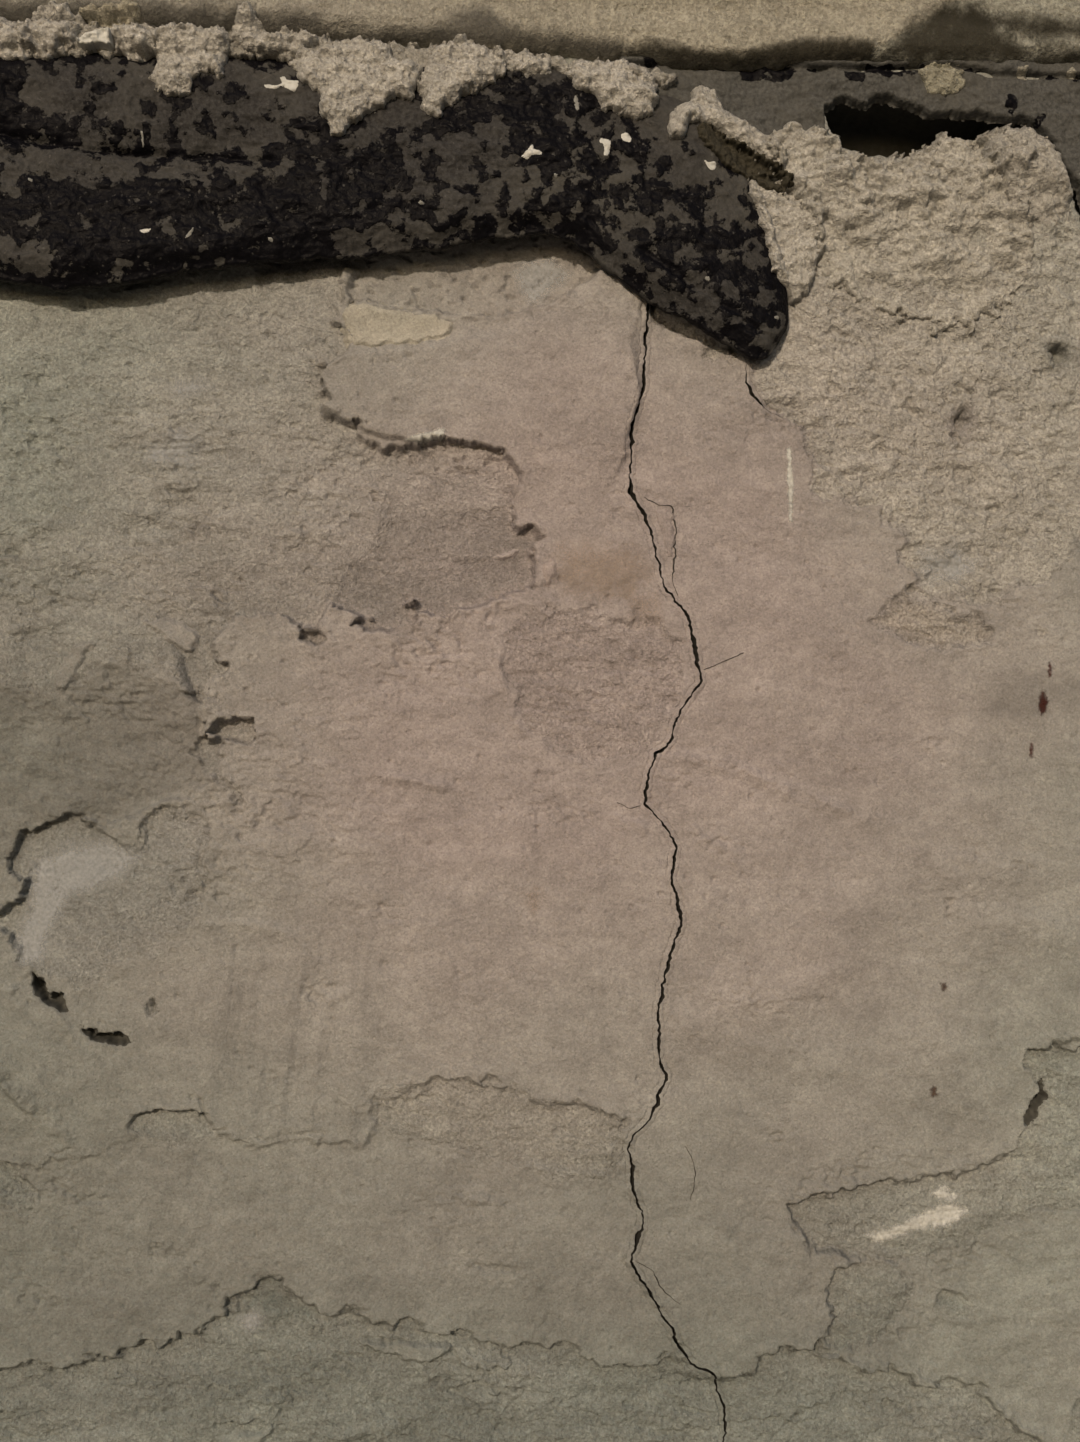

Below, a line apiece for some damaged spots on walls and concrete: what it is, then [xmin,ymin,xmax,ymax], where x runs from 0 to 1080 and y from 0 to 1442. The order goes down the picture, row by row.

spalling [76,27,115,54]
spalling [820,132,904,163]
crack [740,361,783,423]
spalling [638,183,1080,654]
spalling [0,258,686,766]
spalling [0,803,213,989]
crack [608,300,743,1442]
spalling [126,1109,218,1149]
spalling [369,1074,631,1180]
spalling [786,1043,1080,1262]
spalling [240,1274,321,1333]
flaking render [356,1337,452,1365]